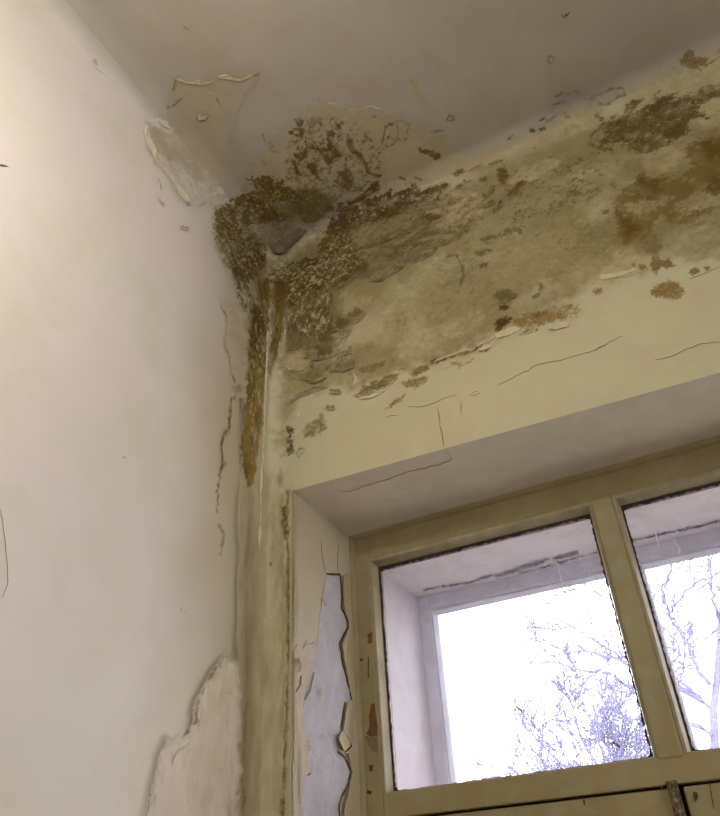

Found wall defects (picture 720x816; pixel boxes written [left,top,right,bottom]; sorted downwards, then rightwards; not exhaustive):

peeling [142,69,260,208]
crack [214,295,254,557]
crack [345,395,462,492]
peeling [289,320,570,418]
water stain [210,42,720,816]
crack [498,336,621,385]
peeling [146,653,245,816]
flaking render [293,572,369,816]